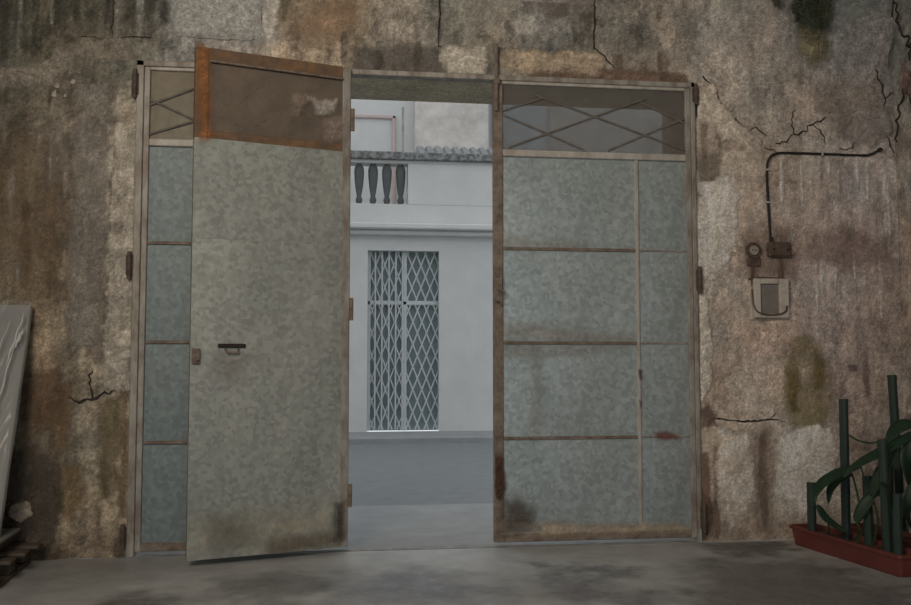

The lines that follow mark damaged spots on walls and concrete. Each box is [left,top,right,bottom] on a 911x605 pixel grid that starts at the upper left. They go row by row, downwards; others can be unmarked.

crack [438,0,461,47]
crack [593,0,615,69]
spalling [501,48,606,77]
crack [702,0,911,153]
corrosion [293,94,334,115]
crack [66,368,121,404]
damp [788,353,824,410]